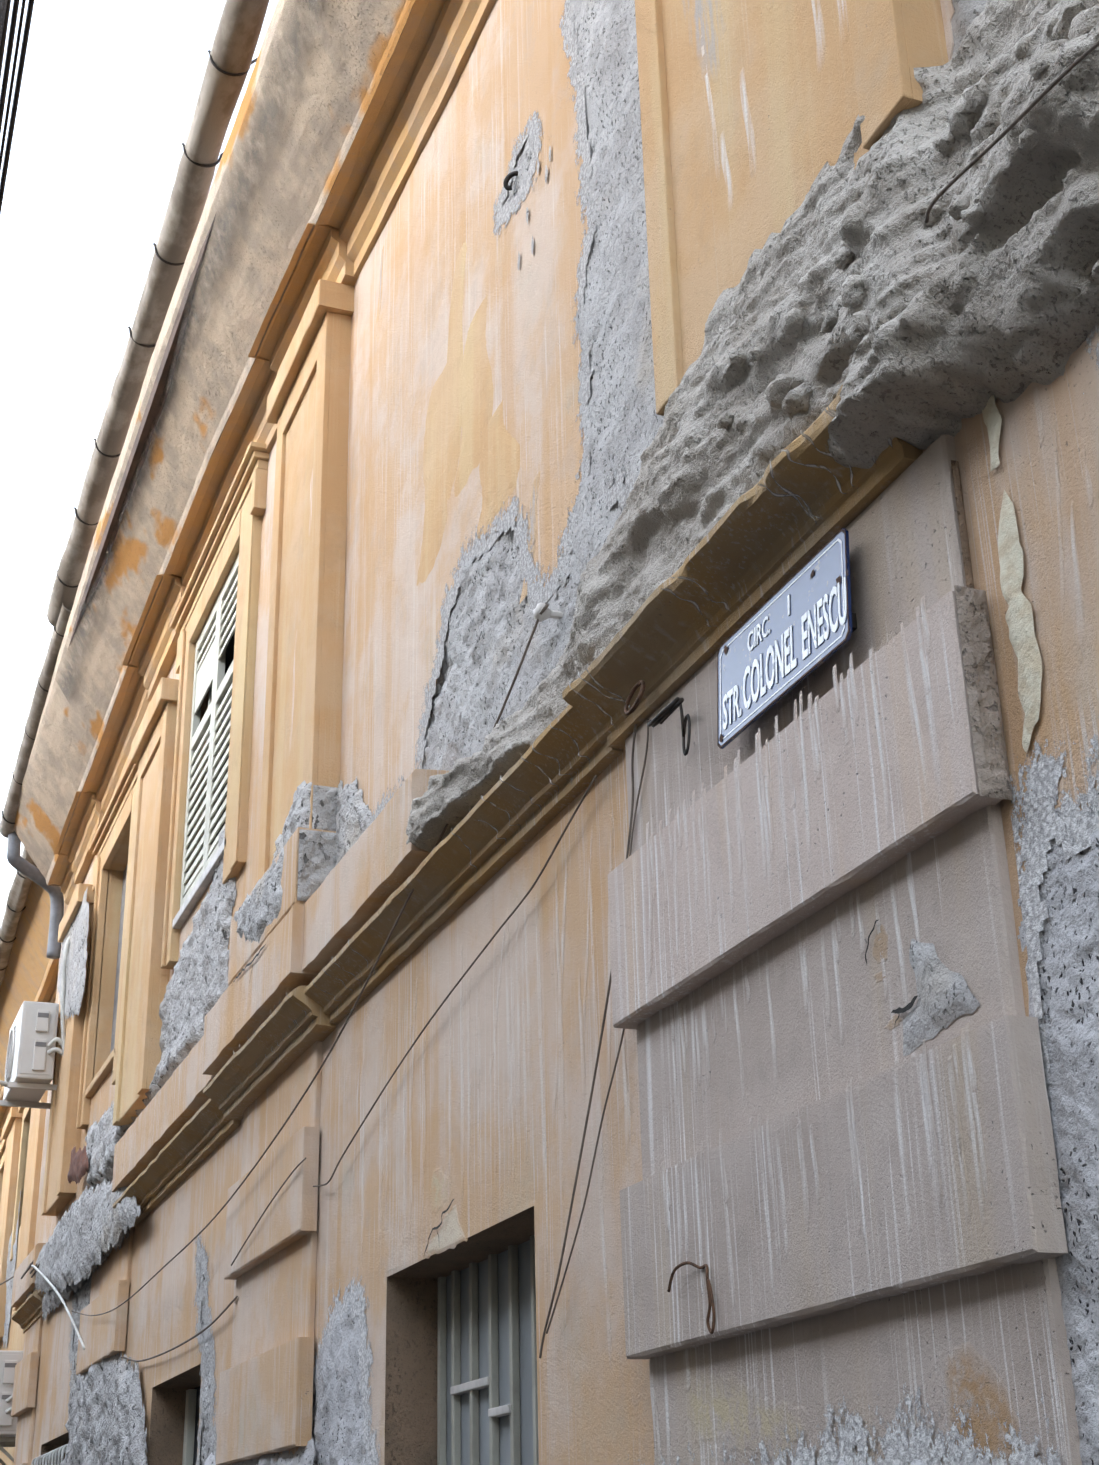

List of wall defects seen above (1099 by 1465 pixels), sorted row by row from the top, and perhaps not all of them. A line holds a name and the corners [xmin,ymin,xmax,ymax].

spalling [951,0,987,53]
peeling [982,395,1002,472]
spalling [2,0,664,1465]
spalling [884,938,980,1056]
spalling [951,460,1099,1465]
spalling [625,1373,1061,1465]